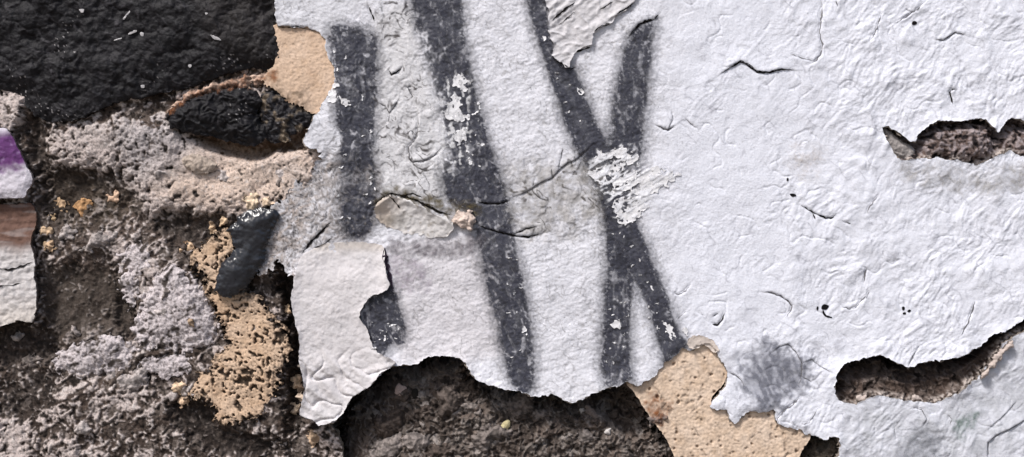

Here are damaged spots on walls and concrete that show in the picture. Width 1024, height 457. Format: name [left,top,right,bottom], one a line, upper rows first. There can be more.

spalling [883,118,1024,165]
crack [481,149,585,238]
spalling [0,24,839,457]
spalling [835,320,1024,404]